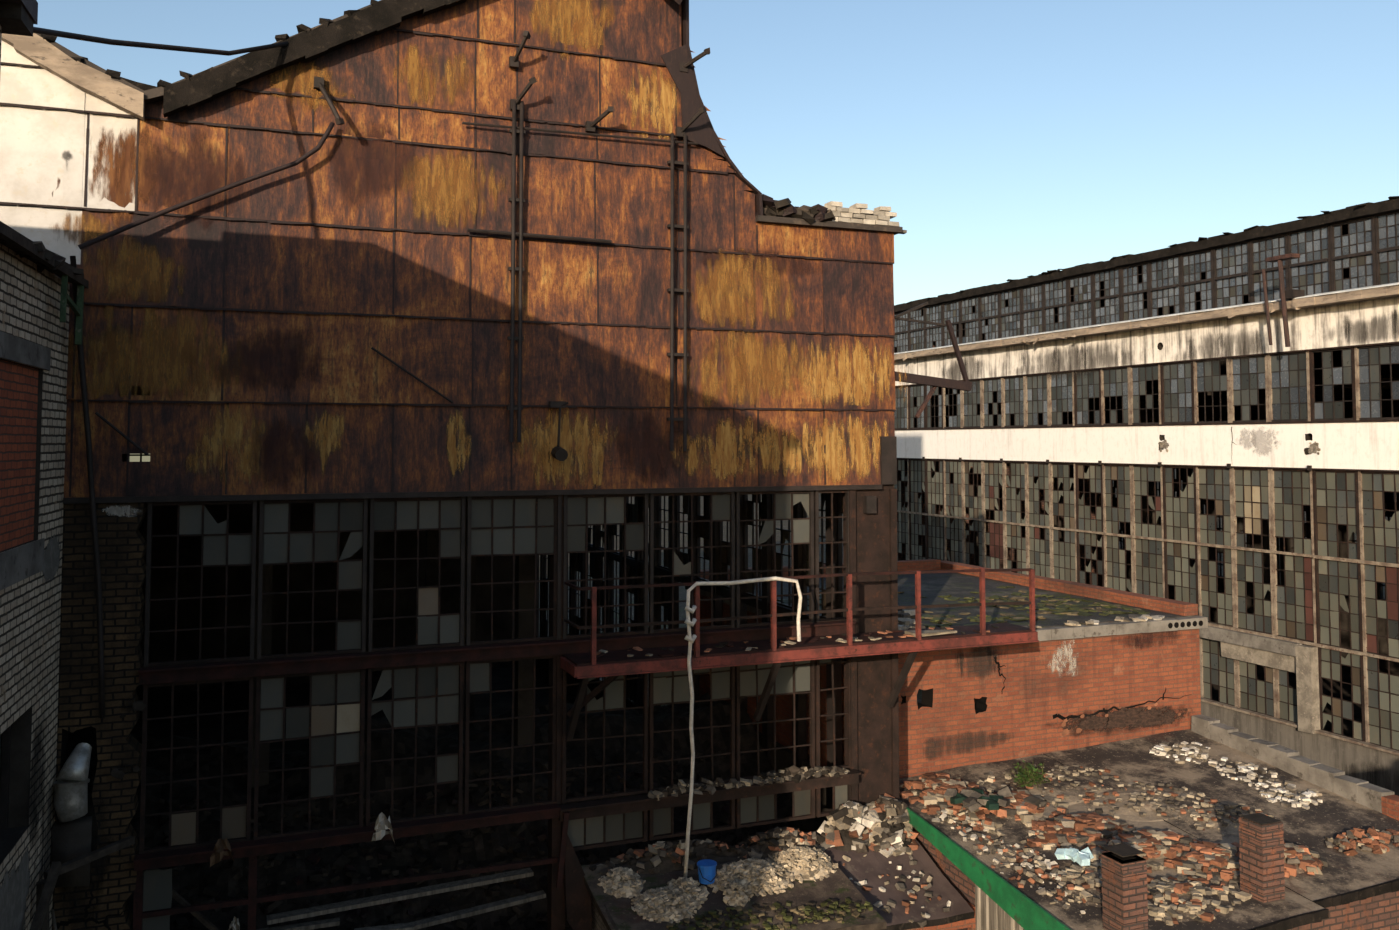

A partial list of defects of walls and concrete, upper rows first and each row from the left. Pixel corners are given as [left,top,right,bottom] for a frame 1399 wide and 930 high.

rust [332,125,412,202]
rust [56,128,160,243]
rust [704,251,809,273]
damp [1345,313,1399,342]
damp [1183,335,1263,362]
crack [1052,689,1192,724]